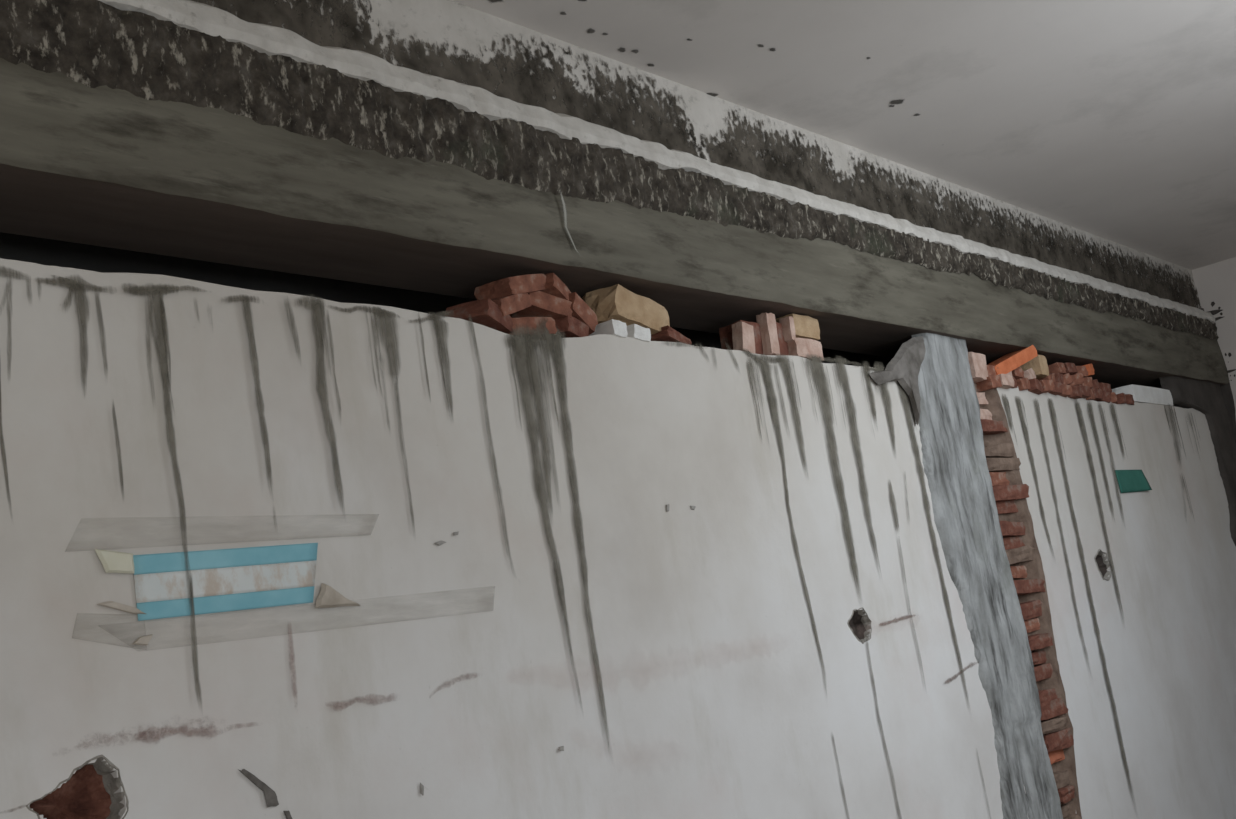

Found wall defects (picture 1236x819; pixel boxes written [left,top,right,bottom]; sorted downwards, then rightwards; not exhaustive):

leakage [191,0,1201,309]
leakage [0,267,201,539]
leakage [186,555,201,700]
leakage [228,295,271,484]
leakage [286,297,403,507]
leakage [415,311,453,413]
leakage [507,321,609,744]
leakage [731,350,968,699]
spalling [847,607,872,644]
flaking render [974,362,1135,819]
leakage [1003,397,1132,790]
spalling [26,755,129,819]